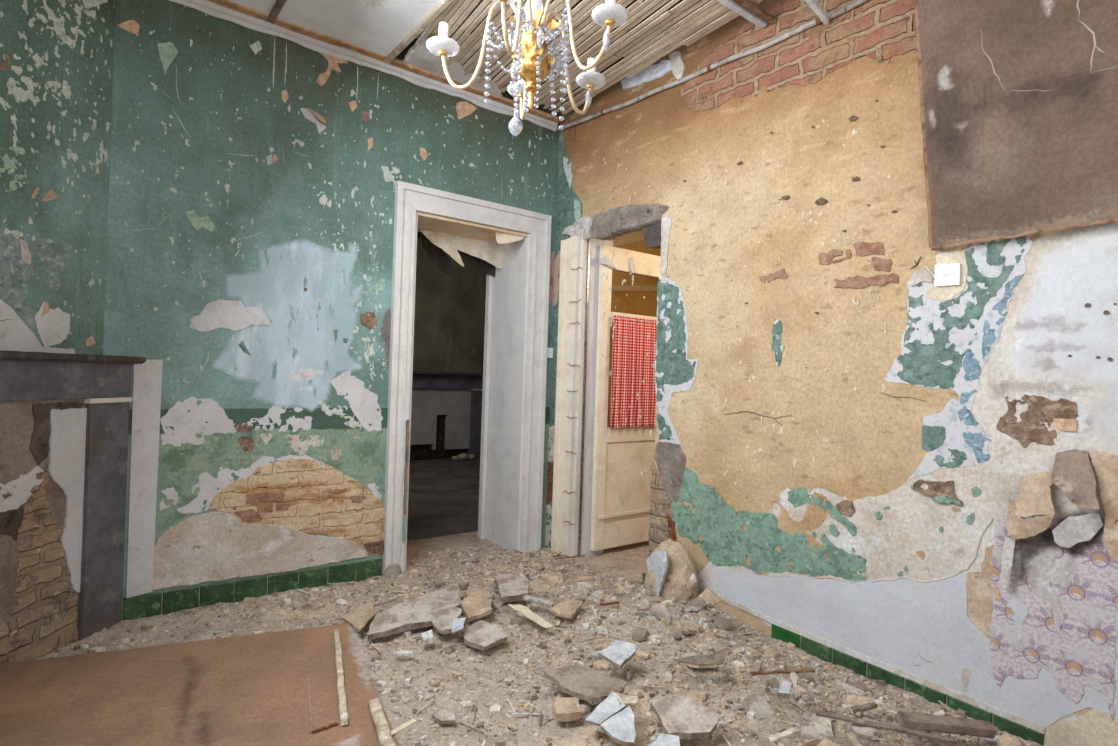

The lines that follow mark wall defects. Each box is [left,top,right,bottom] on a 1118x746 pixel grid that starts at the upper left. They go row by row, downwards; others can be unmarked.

peeling [250,41,269,60]
flaking render [680,0,917,112]
crack [981,31,1055,92]
crack [1076,0,1117,74]
flaking render [157,52,525,556]
peeling [494,124,583,463]
peeling [595,247,788,482]
flaking render [801,198,828,224]
peeling [816,230,1118,642]
flaking render [0,468,78,668]
peeling [641,461,890,639]
flaking render [837,680,885,719]